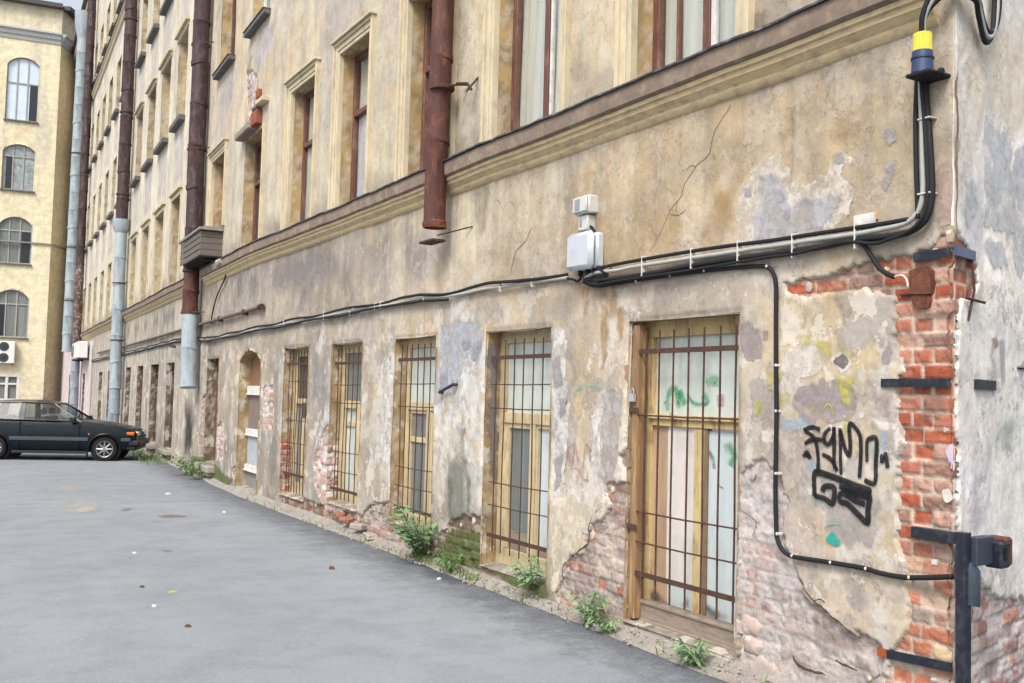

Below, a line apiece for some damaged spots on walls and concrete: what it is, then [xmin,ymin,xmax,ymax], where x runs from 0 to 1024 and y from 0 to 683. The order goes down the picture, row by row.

crack [650,106,730,251]
flaking render [263,383,274,430]
flaking render [279,404,403,544]
crack [562,509,598,577]
flaking render [550,327,635,627]
flaking render [736,116,1024,683]